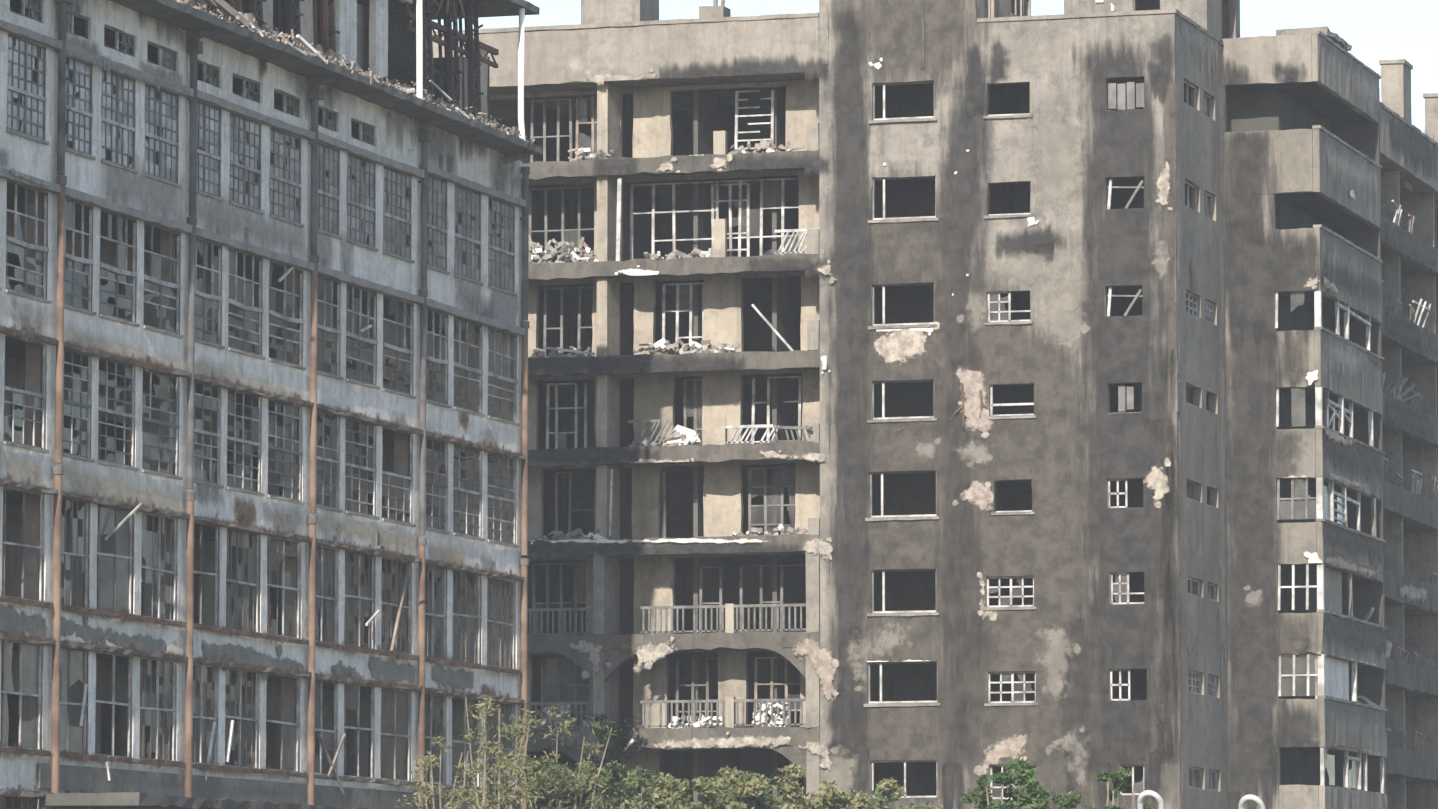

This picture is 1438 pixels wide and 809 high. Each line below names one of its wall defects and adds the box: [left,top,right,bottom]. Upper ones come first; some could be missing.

spalling [952,293,987,331]
spalling [874,322,940,365]
damp [659,0,1387,809]
spalling [952,367,994,511]
spalling [1143,458,1171,508]
peeling [0,604,183,664]
peeling [202,640,304,681]
spalling [569,639,612,679]
spalling [633,636,674,674]
spalling [792,623,928,701]
spalling [974,734,1027,776]
spalling [1046,727,1085,784]